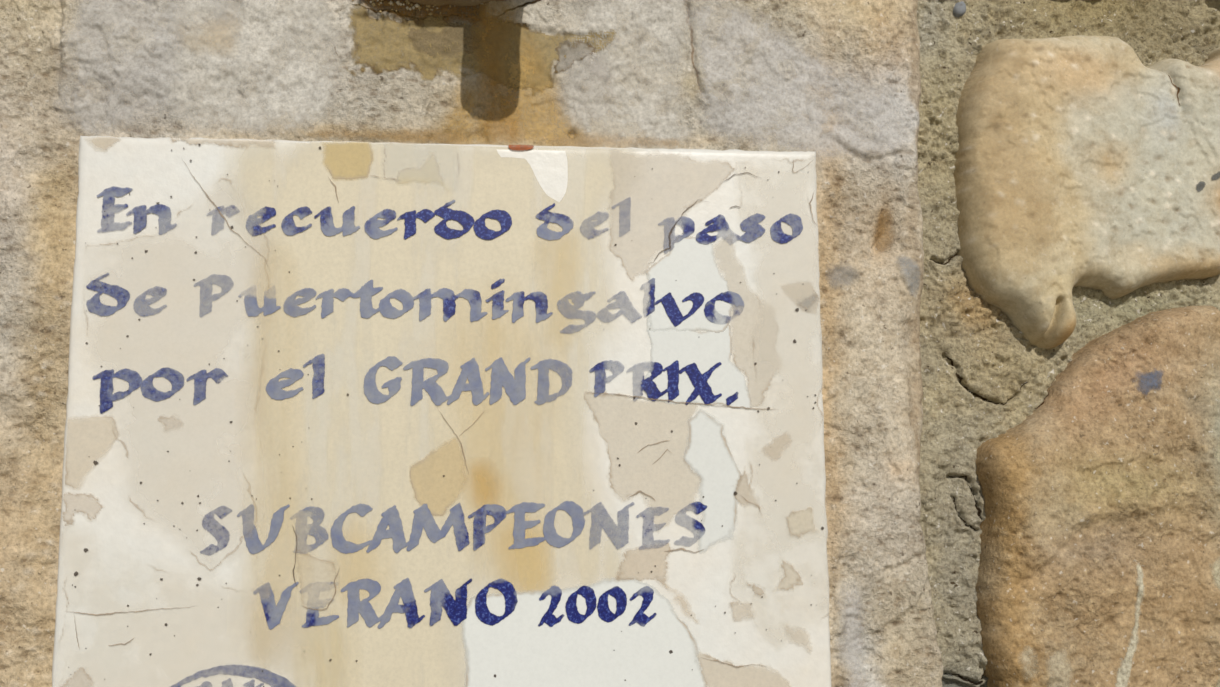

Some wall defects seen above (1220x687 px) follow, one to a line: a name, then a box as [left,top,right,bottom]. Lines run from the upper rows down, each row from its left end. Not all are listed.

peeling [326,142,385,179]
water stain [243,143,615,687]
peeling [410,440,464,516]
peeling [584,236,772,552]
peeling [463,543,788,687]
peeling [780,561,803,590]